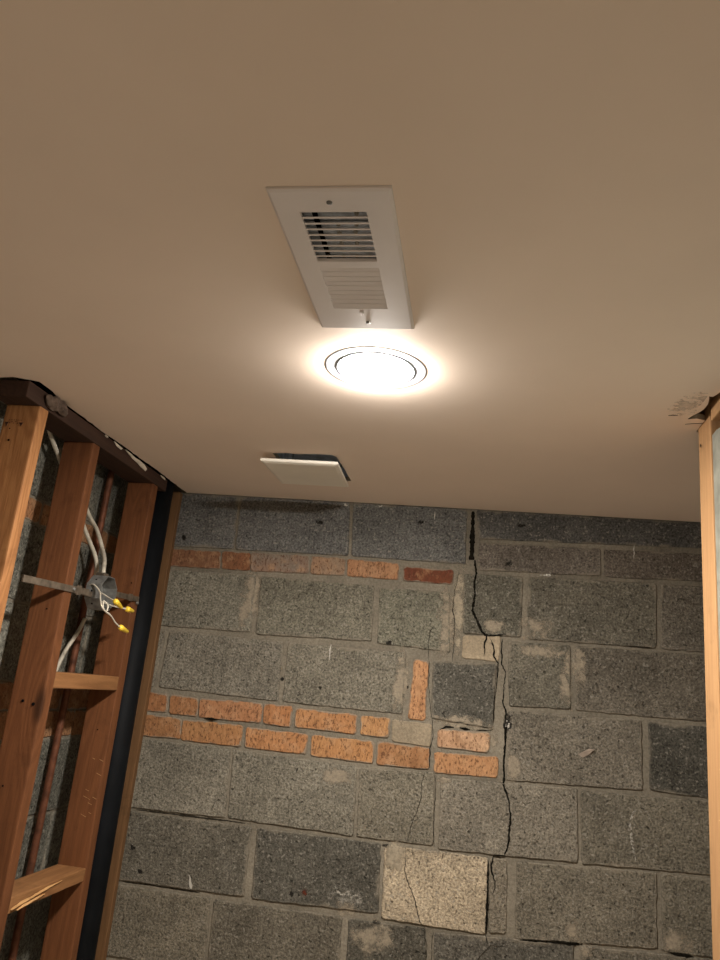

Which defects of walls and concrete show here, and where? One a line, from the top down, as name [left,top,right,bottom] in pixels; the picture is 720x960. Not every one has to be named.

crack [404,560,512,960]